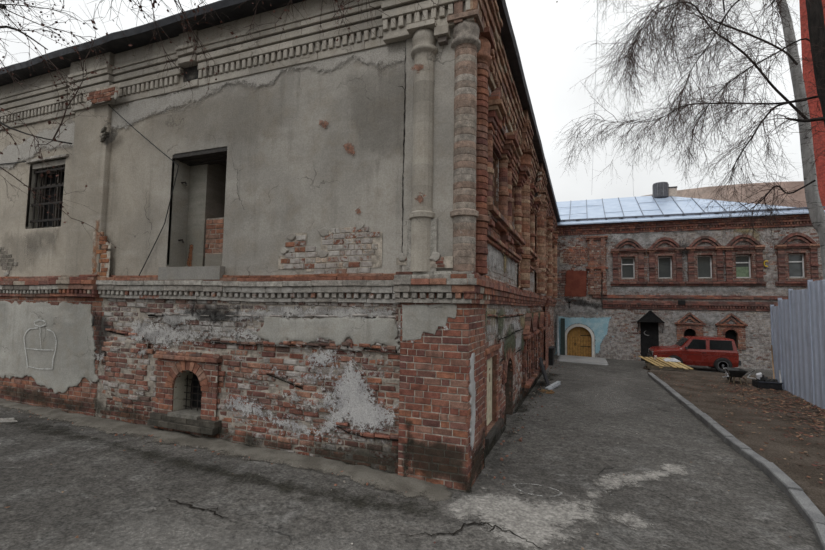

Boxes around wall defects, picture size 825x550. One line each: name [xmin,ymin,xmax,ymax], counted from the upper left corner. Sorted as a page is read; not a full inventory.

flaking render [84,83,120,108]
flaking render [278,208,382,274]
peeling [105,302,401,447]